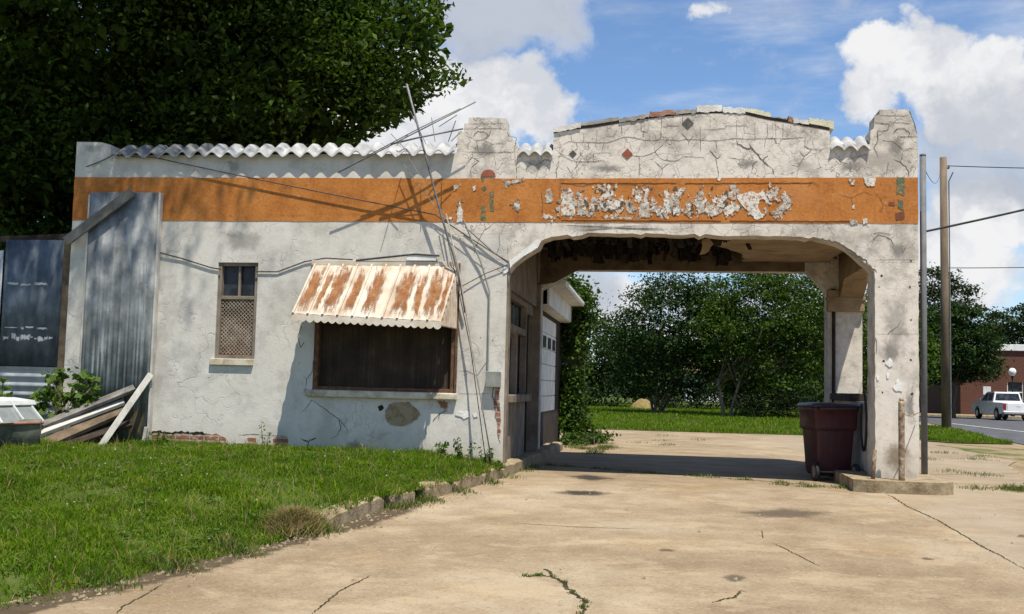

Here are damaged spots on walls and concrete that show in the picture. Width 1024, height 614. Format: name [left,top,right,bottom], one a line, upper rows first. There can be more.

crack [467,111,917,218]
peeling [445,177,524,222]
peeling [541,177,793,222]
rust [299,266,385,311]
peeling [876,357,903,392]
crack [234,358,345,446]
spalling [385,402,420,426]
spalling [151,433,227,444]
crack [885,493,1019,566]
crack [526,569,588,614]